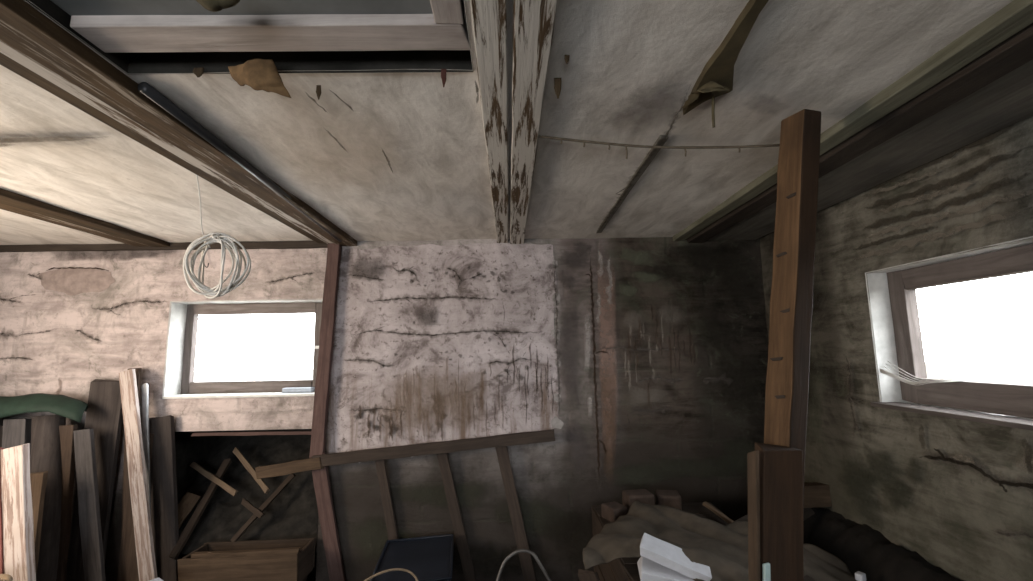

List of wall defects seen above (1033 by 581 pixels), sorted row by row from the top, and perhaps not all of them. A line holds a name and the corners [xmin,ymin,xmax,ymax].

crack [353,268,526,377]
water stain [560,312,592,405]
crack [924,448,1033,492]